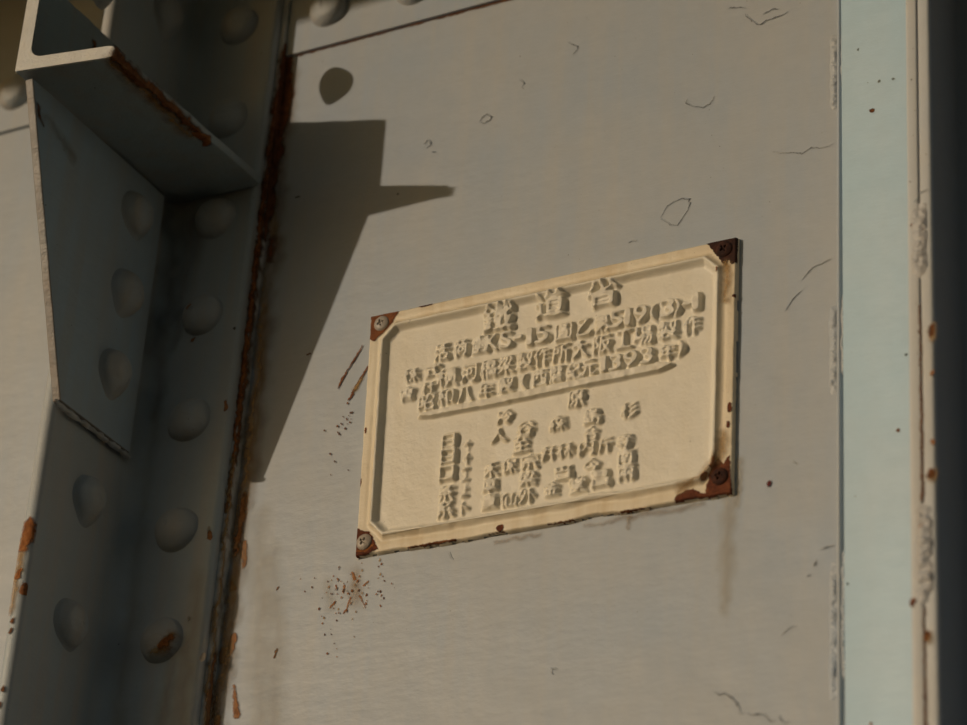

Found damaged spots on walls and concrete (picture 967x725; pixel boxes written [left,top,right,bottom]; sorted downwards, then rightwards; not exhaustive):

crack [727,6,788,25]
rust [108,46,211,147]
rust [707,237,738,301]
rust [204,0,508,725]
rust [674,433,733,504]
rust [8,517,37,634]
crack [714,691,789,724]